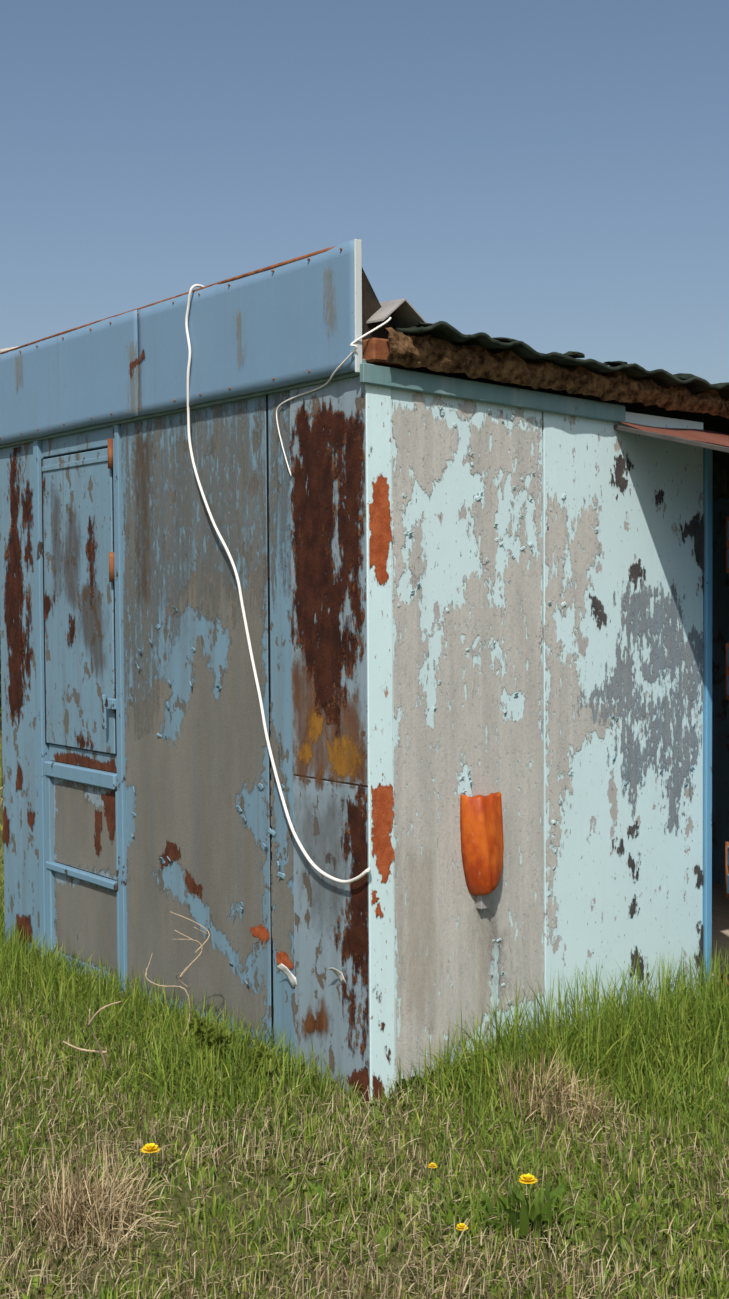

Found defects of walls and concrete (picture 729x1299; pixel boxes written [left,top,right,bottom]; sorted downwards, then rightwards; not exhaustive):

rust [1,447,102,728]
rust [54,731,116,773]
rust [94,790,116,857]
peeling [54,561,297,1037]
rust [159,840,203,899]
rust [289,395,394,1103]
peeling [392,392,704,1092]